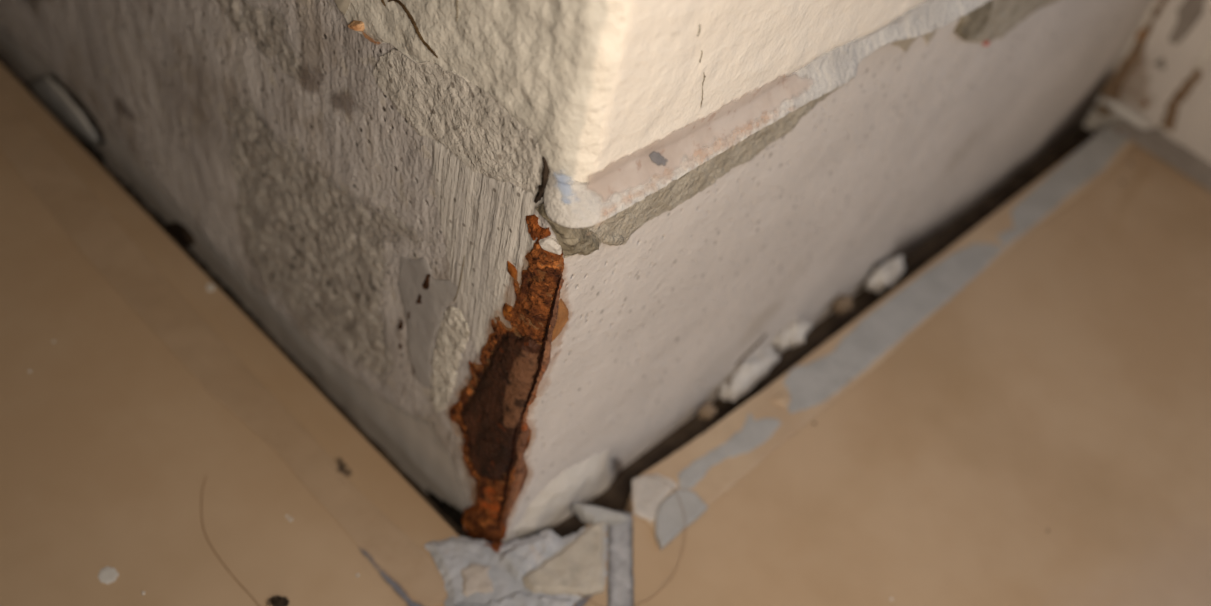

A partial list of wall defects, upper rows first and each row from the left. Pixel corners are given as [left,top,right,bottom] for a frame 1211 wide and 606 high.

crack [381,0,438,58]
spalling [892,30,936,52]
spalling [954,0,1057,43]
spalling [539,79,851,258]
peeling [398,256,470,413]
rust [449,214,569,553]